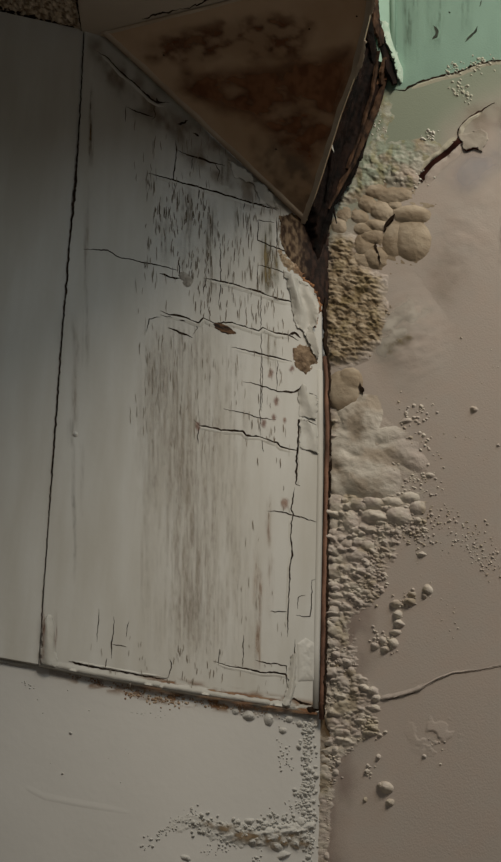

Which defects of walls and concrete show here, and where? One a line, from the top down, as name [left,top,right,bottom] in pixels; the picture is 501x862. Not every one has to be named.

flaking render [329,96,442,233]
crack [399,54,501,184]
water stain [262,228,278,287]
crack [0,0,316,705]
peeling [284,271,320,454]
crack [380,664,501,701]